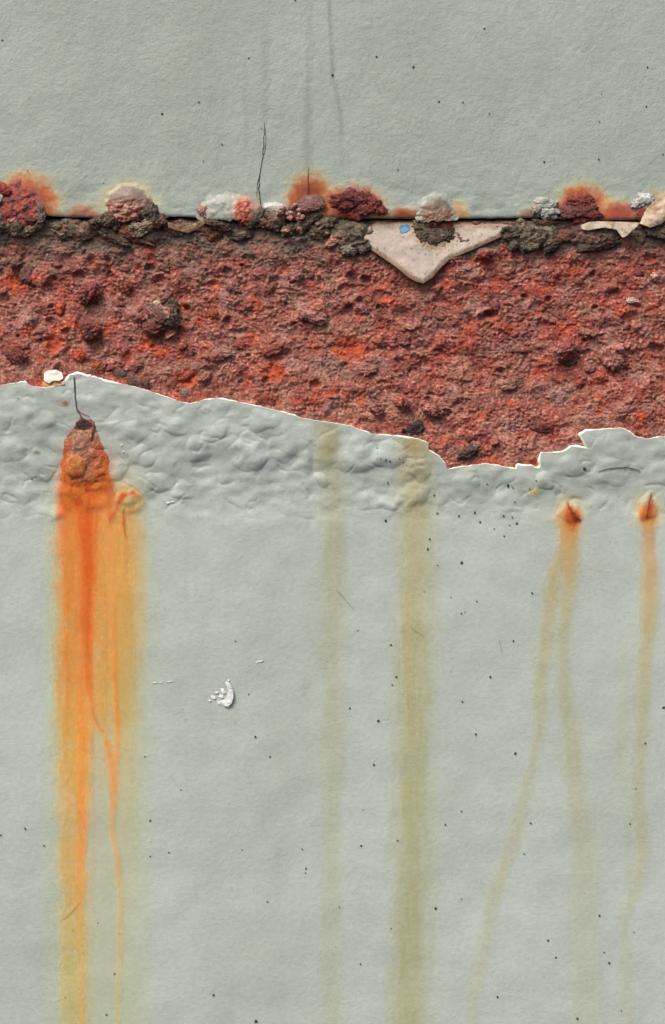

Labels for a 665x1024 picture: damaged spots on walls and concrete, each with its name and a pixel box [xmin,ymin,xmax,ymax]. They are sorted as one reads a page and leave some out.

peeling [167,219,206,233]
peeling [581,193,665,240]
peeling [364,222,510,283]
corrosion [0,173,665,469]
peeling [42,370,65,387]
corrosion [556,499,585,529]
corrosion [635,490,658,525]
corrosion [57,417,142,1024]